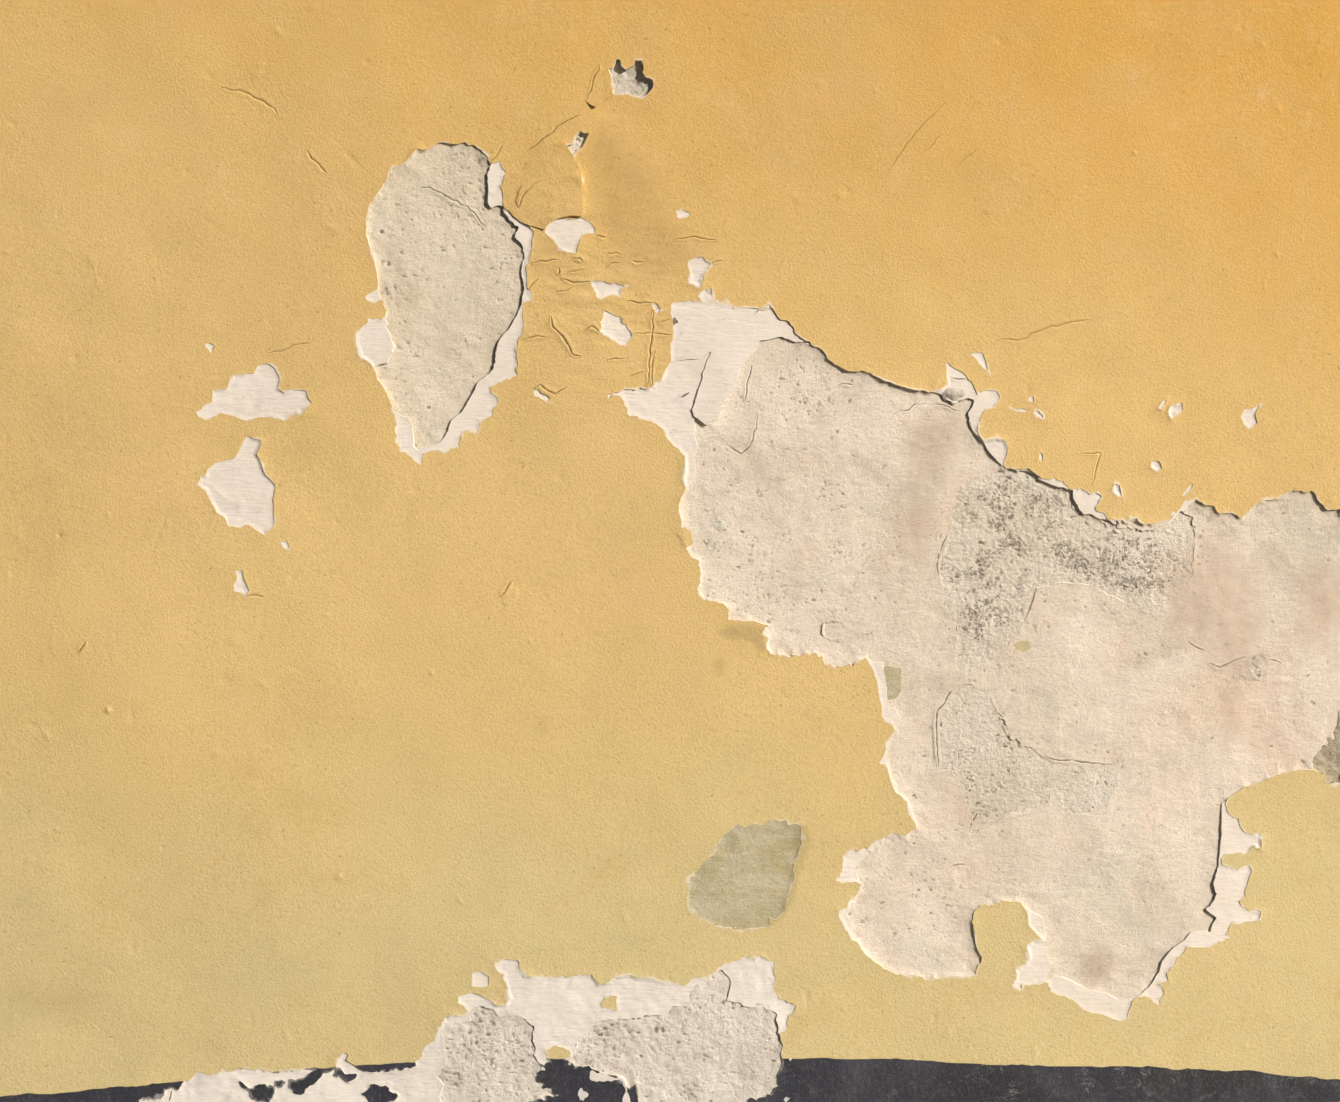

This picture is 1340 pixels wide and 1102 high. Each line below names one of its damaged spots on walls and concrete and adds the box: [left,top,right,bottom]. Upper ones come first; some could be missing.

spalling [610,60,653,97]
flaking render [356,132,595,464]
crack [524,231,671,400]
crack [674,232,723,267]
peeling [197,364,312,420]
peeling [198,436,275,535]
flaking render [608,257,1340,1020]
flaking render [139,956,796,1102]